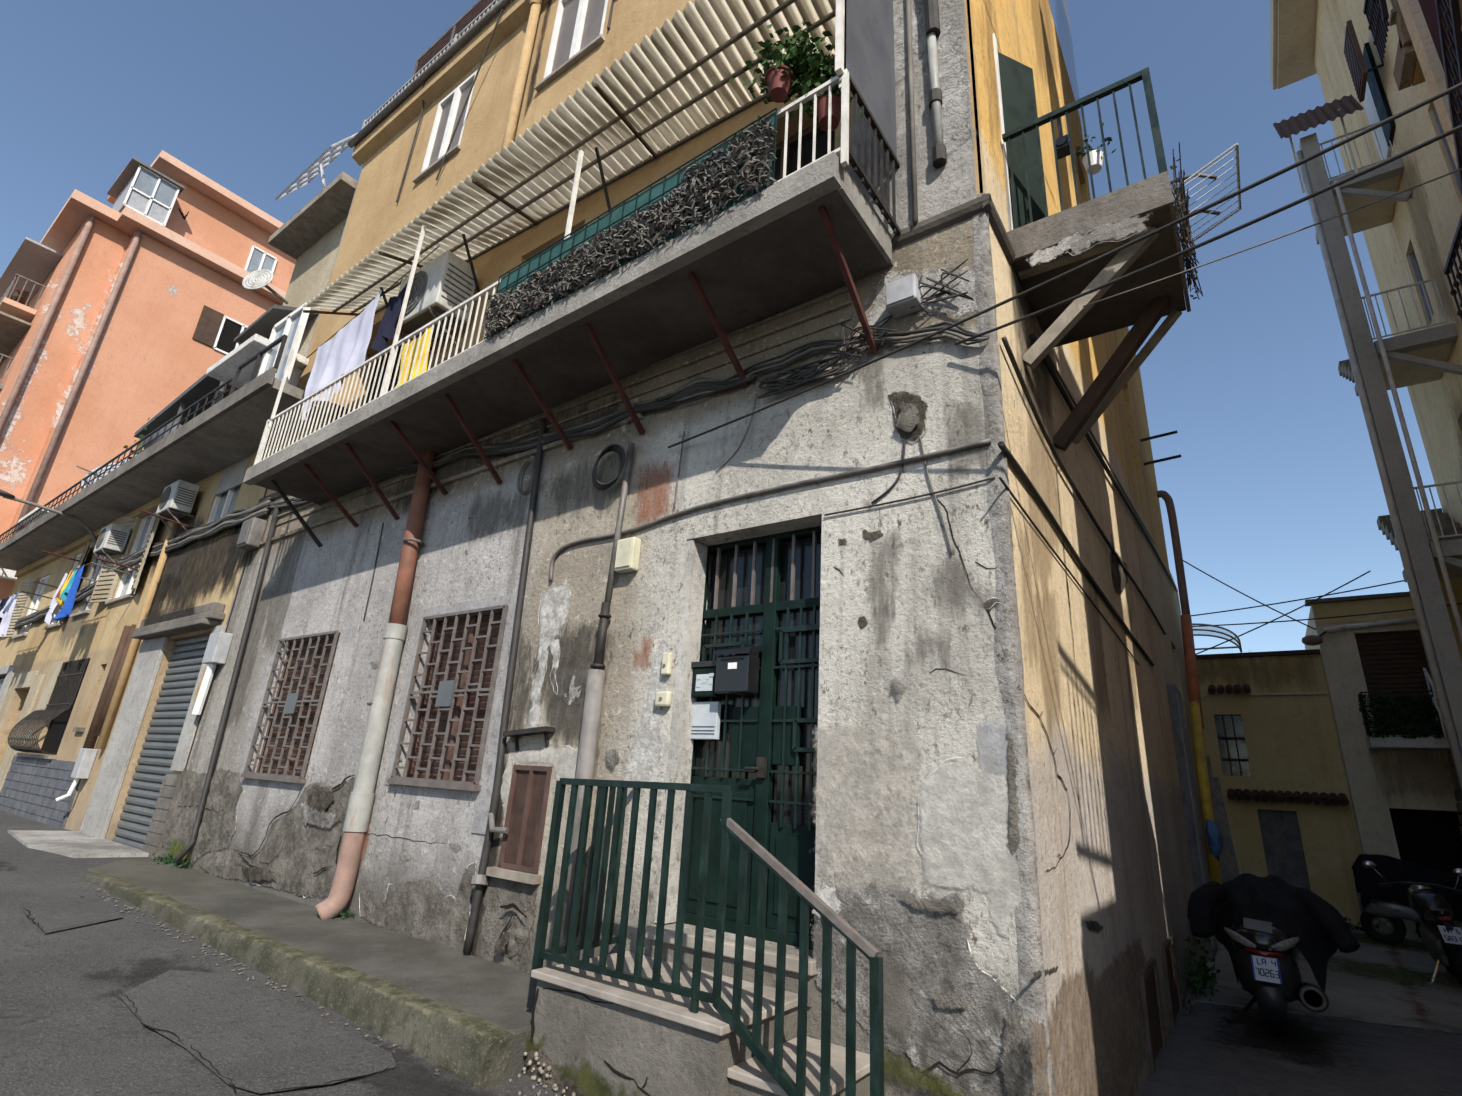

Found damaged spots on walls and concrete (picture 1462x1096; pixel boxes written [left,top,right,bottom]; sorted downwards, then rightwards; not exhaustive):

spalling [1026,213,1152,266]
peeling [0,263,130,493]
spalling [888,390,928,443]
rust [638,466,670,521]
damp [144,511,254,626]
crack [938,499,998,630]
peeling [527,583,581,728]
spalling [162,767,356,898]
crack [1019,685,1071,871]
crack [121,993,388,1094]
crack [604,1060,650,1096]
crack [922,1039,1002,1076]